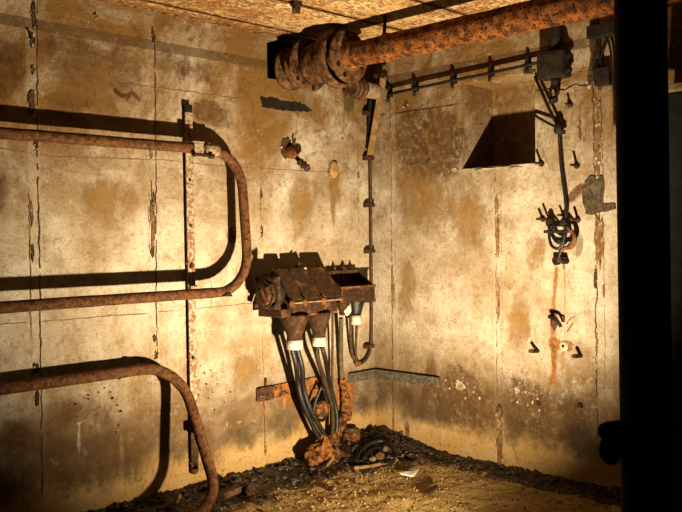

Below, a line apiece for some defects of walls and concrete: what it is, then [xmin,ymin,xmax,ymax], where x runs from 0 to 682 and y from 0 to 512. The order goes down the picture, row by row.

spalling [28,0,36,48]
spalling [27,89,36,118]
rust [551,264,565,315]
rust [549,328,572,387]
damp [401,366,489,426]
damp [509,377,587,455]